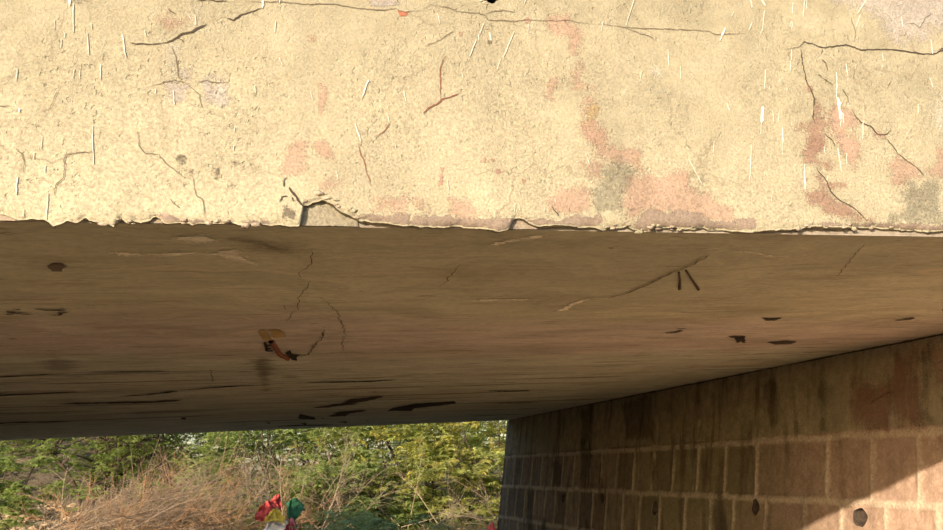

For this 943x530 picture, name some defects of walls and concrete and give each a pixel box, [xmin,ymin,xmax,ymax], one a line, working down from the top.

crack [131,0,744,113]
crack [791,18,943,176]
crack [137,132,205,212]
peeling [149,213,269,229]
crack [279,178,303,206]
peeling [282,190,758,234]
crack [817,169,866,220]
crack [610,255,709,298]
crack [295,302,347,358]
crack [277,380,391,427]